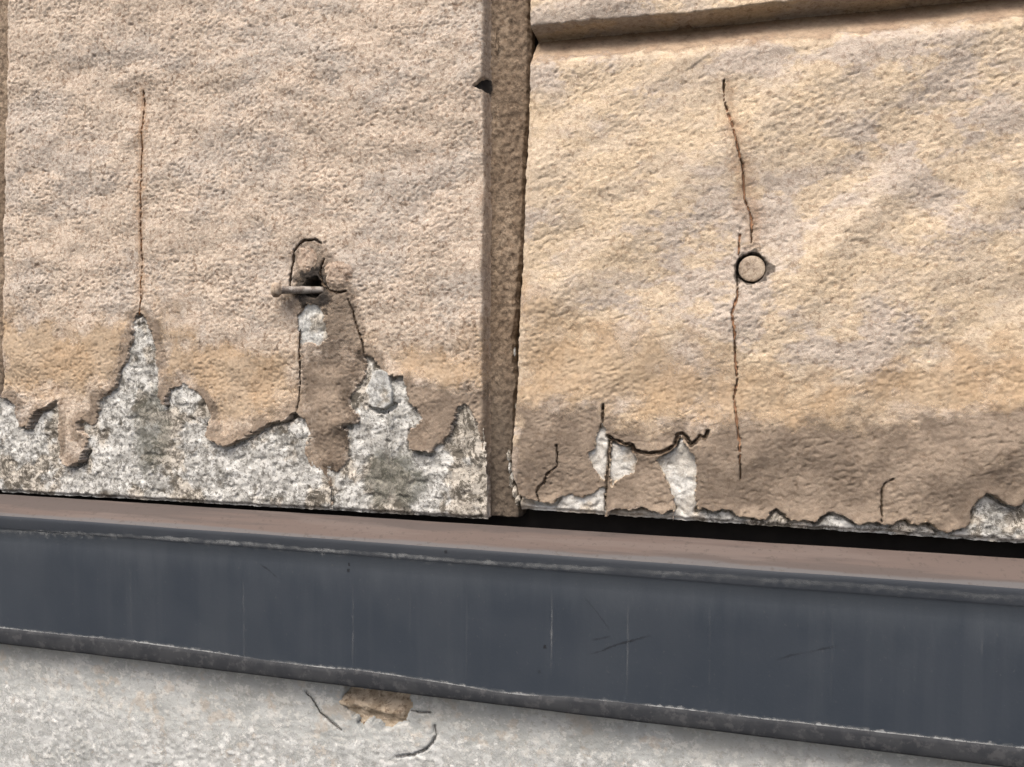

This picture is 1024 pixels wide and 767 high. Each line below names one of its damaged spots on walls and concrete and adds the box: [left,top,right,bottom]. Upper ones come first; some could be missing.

crack [138,91,146,315]
crack [723,81,754,254]
spalling [0,316,488,519]
crack [294,329,302,414]
spalling [298,304,328,346]
crack [289,239,364,354]
crack [535,445,558,501]
crack [600,404,707,510]
crack [730,279,741,479]
spalling [506,423,1024,543]